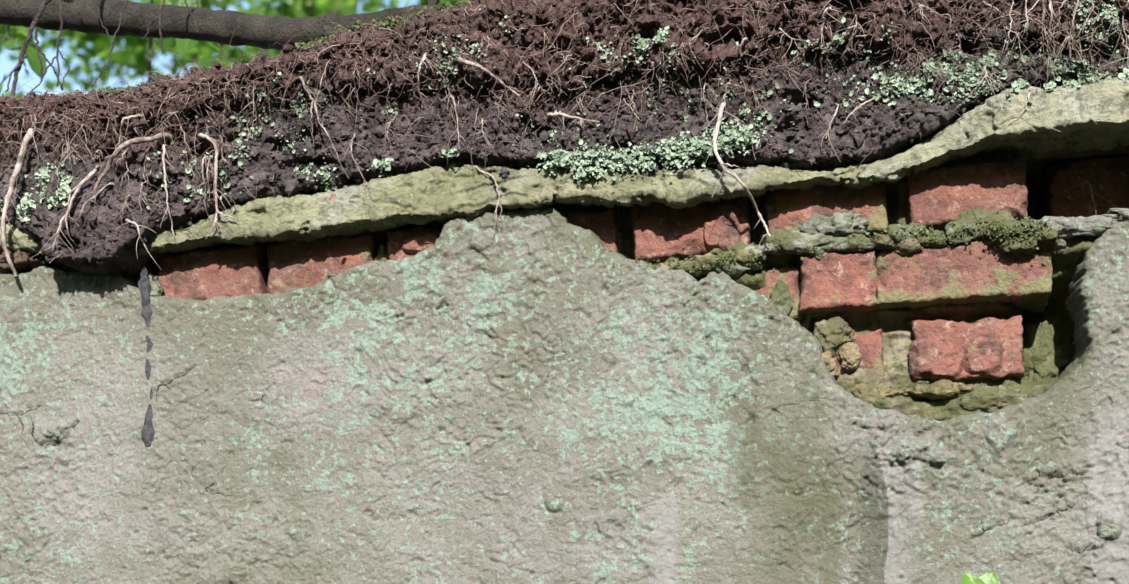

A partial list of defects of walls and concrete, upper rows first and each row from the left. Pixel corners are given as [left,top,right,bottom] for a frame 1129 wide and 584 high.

peeling [0,248,78,273]
peeling [139,258,164,297]
spalling [354,223,445,262]
peeling [555,142,1129,421]
leakage [138,266,155,447]